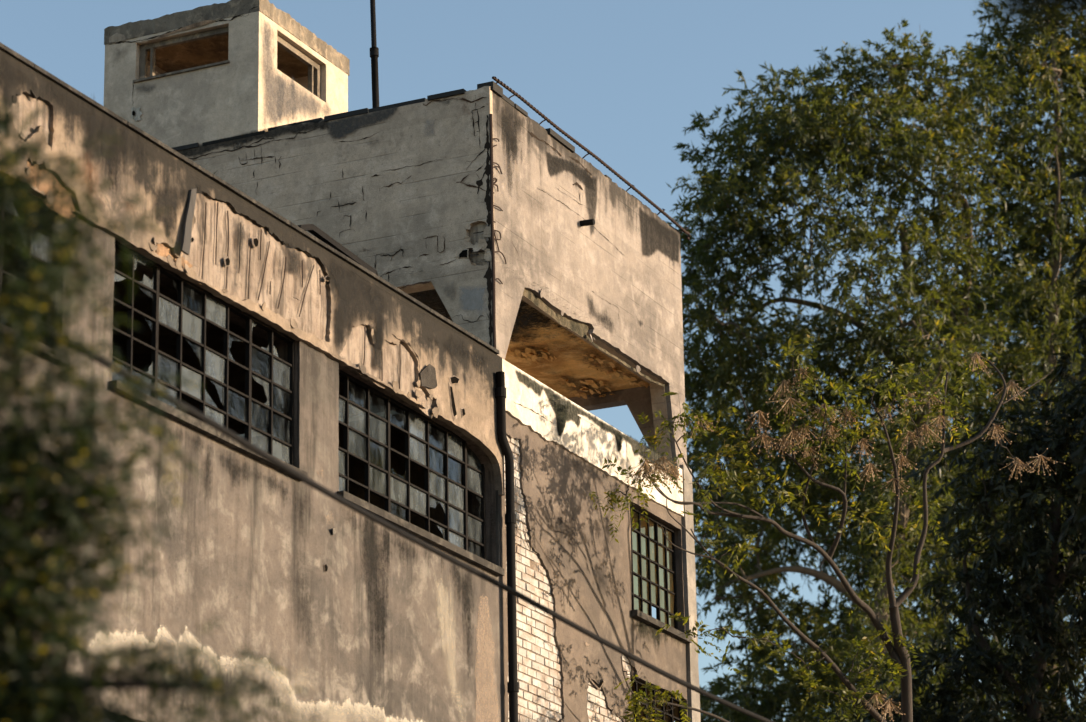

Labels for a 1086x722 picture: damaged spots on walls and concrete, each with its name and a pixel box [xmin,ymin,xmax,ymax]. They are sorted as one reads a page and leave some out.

water stain [177,25,397,156]
crack [188,129,379,194]
crack [317,160,456,289]
crack [423,97,486,191]
water stain [502,111,522,179]
water stain [547,153,597,233]
water stain [640,208,679,262]
water stain [327,261,384,368]
water stain [516,370,678,480]
peeling [476,436,562,722]
peeling [587,681,622,722]
peeling [621,655,639,698]